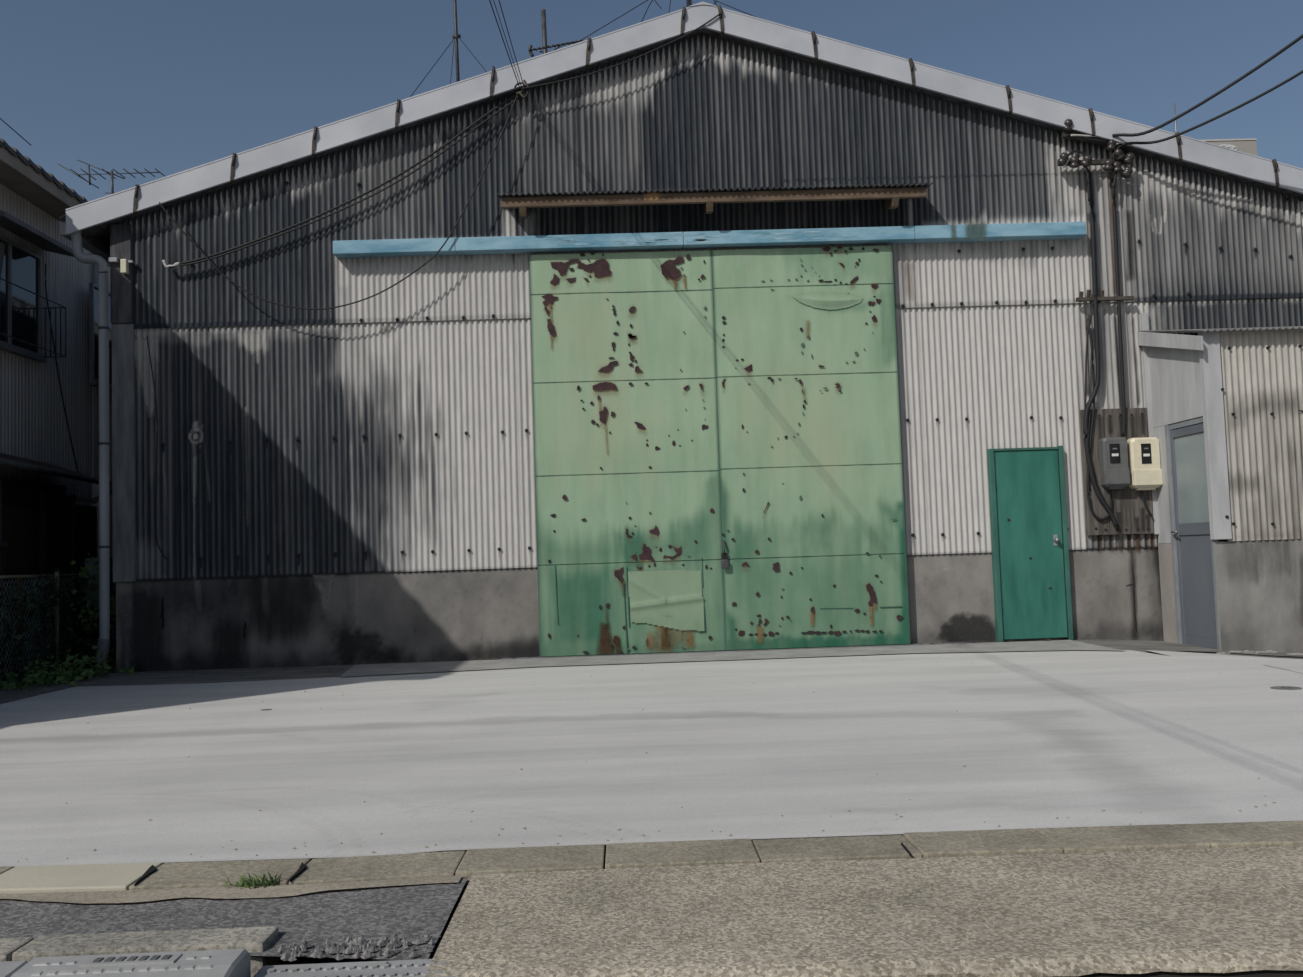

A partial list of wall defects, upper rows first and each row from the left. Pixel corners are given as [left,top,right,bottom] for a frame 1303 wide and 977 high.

water stain [135,338,155,413]
water stain [337,630,397,664]
rust [597,620,620,654]
rust [648,626,693,650]
water stain [939,614,996,642]